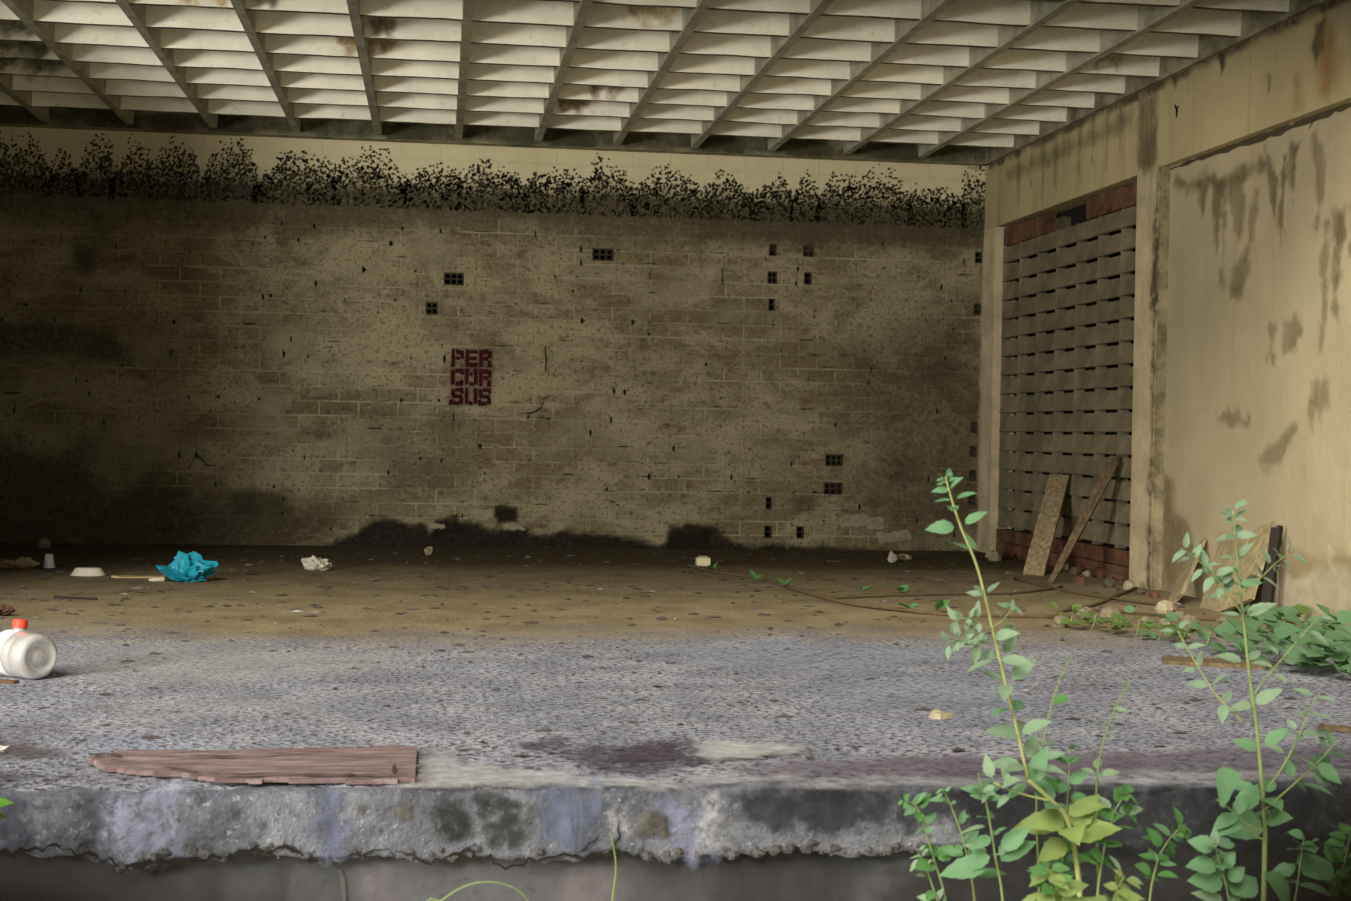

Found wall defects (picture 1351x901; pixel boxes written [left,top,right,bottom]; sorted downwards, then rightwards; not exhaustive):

damp [0,21,62,70]
corrosion [340,38,396,57]
damp [0,36,1257,246]
damp [0,448,850,550]
spalling [121,842,365,869]
spalling [596,810,700,865]
spalling [721,839,941,861]